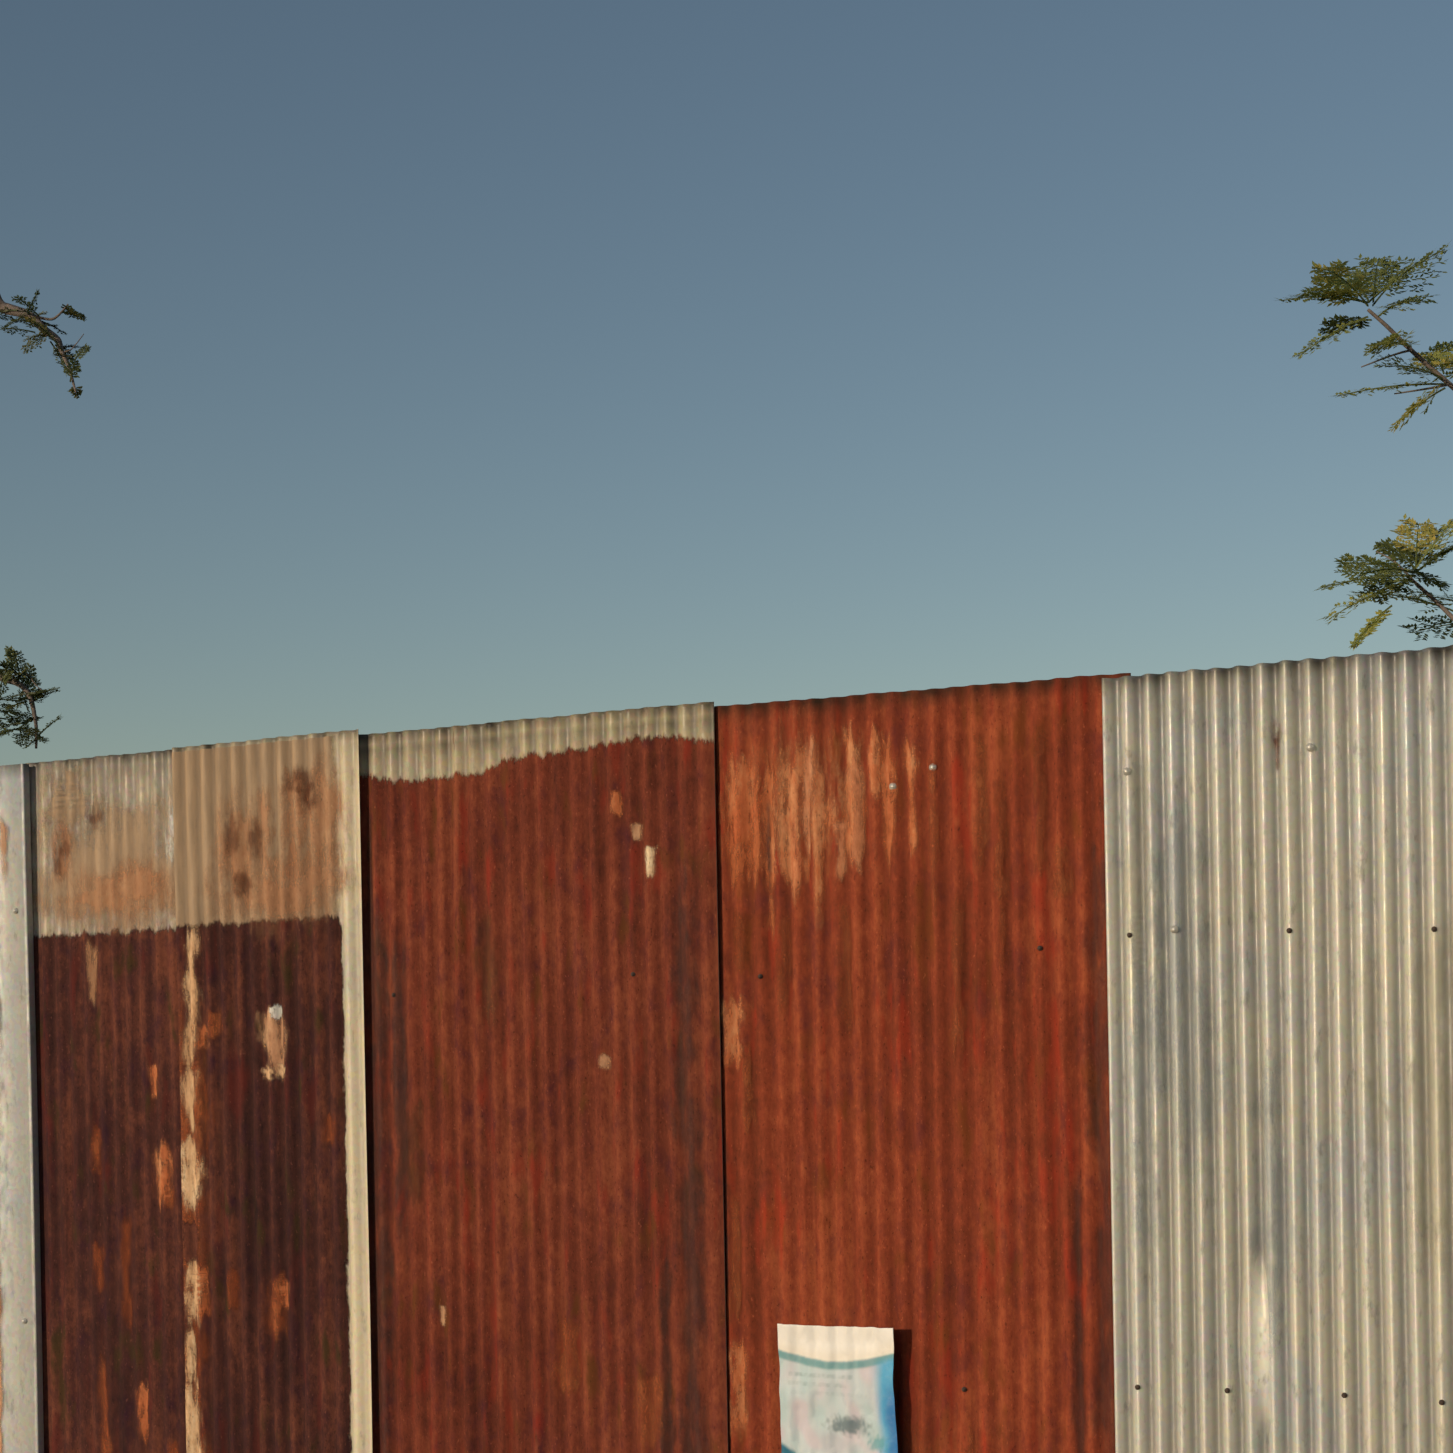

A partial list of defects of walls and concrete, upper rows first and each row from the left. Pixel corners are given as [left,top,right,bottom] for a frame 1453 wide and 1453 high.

corrosion [33,726,918,1453]